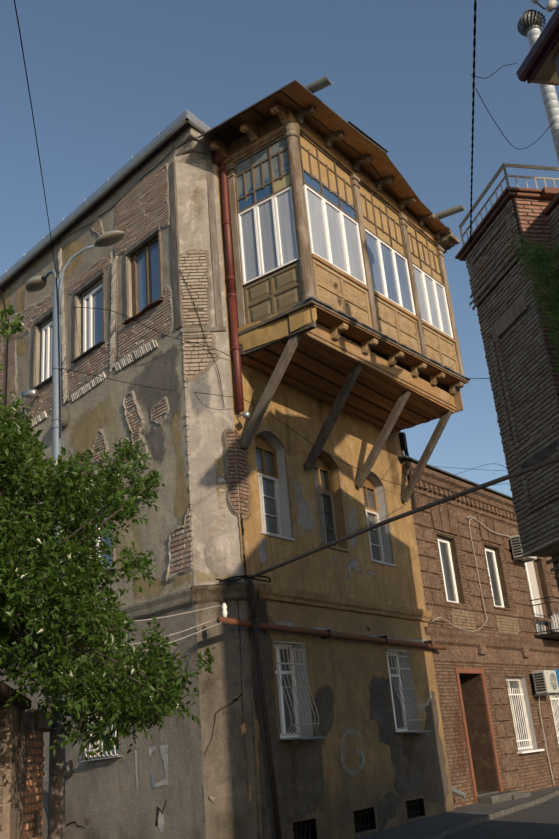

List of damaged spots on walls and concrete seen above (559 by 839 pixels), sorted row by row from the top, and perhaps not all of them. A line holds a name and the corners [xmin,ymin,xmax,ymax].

spalling [0,162,220,431]
peeling [70,401,110,477]
spalling [116,390,230,599]
spalling [216,427,252,521]